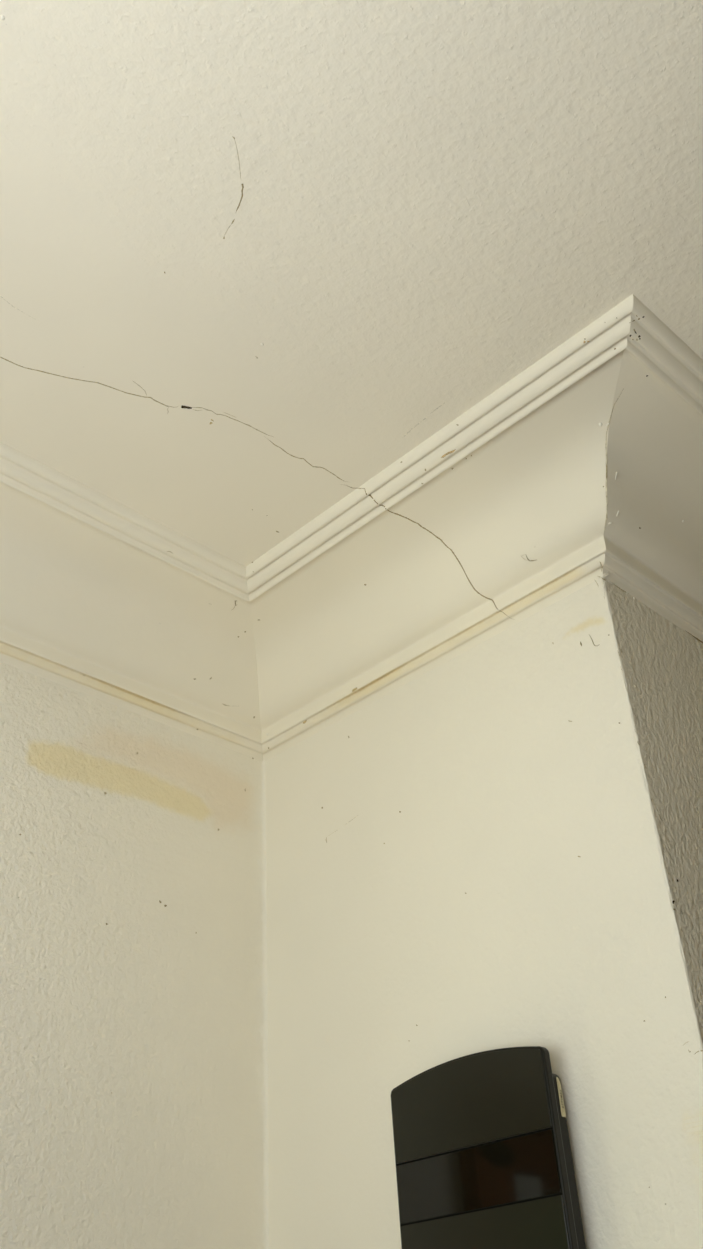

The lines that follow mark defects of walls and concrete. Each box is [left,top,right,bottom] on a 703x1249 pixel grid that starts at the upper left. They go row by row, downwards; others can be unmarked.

crack [223,136,244,239]
crack [0,357,512,619]